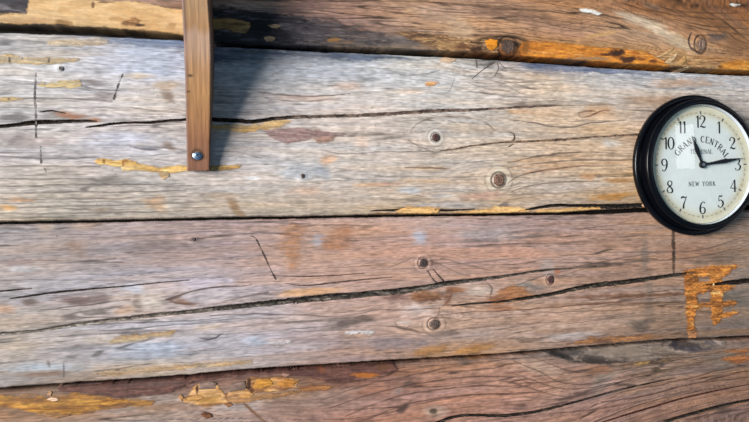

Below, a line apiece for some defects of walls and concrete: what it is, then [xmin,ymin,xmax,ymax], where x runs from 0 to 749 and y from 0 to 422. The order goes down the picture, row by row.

peeling [520,41,749,76]
crack [0,72,186,171]
crack [212,105,562,124]
peeling [95,158,187,179]
crack [0,236,749,336]
peeling [0,383,154,418]
peeling [178,366,332,418]
crack [437,378,674,422]
crack [604,384,749,422]